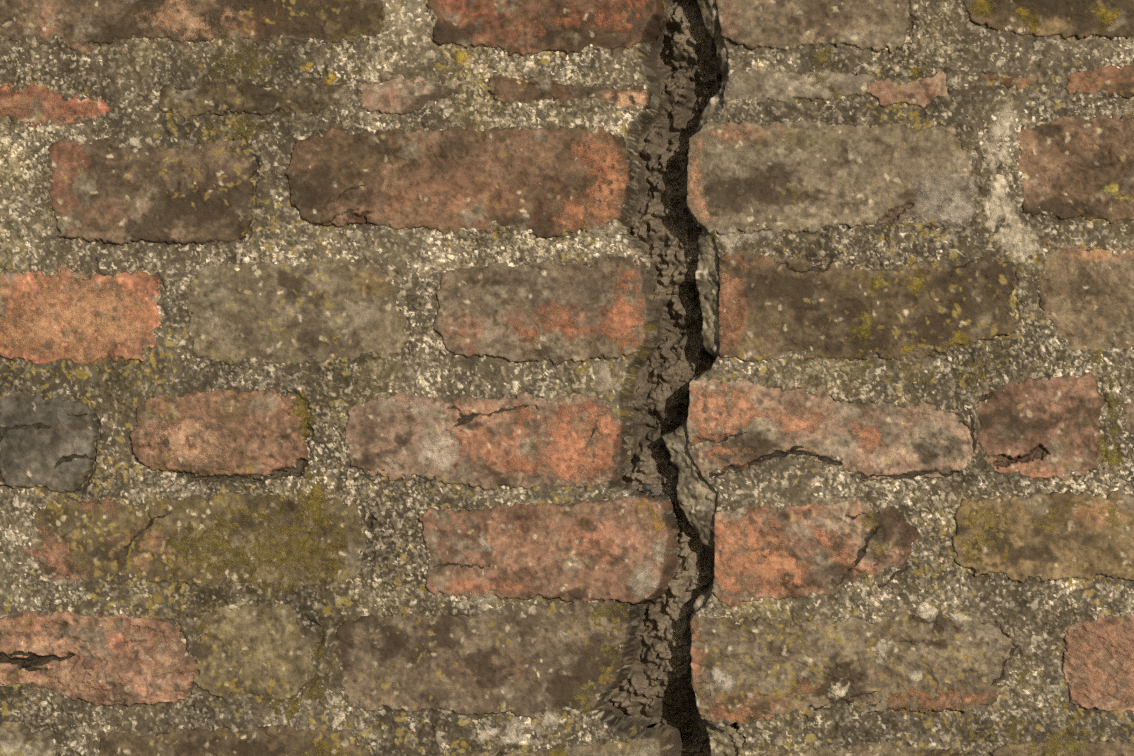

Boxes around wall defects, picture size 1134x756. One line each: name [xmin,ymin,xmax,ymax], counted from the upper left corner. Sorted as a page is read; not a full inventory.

crack [606,0,994,756]
crack [447,405,538,427]
crack [991,645,1019,686]